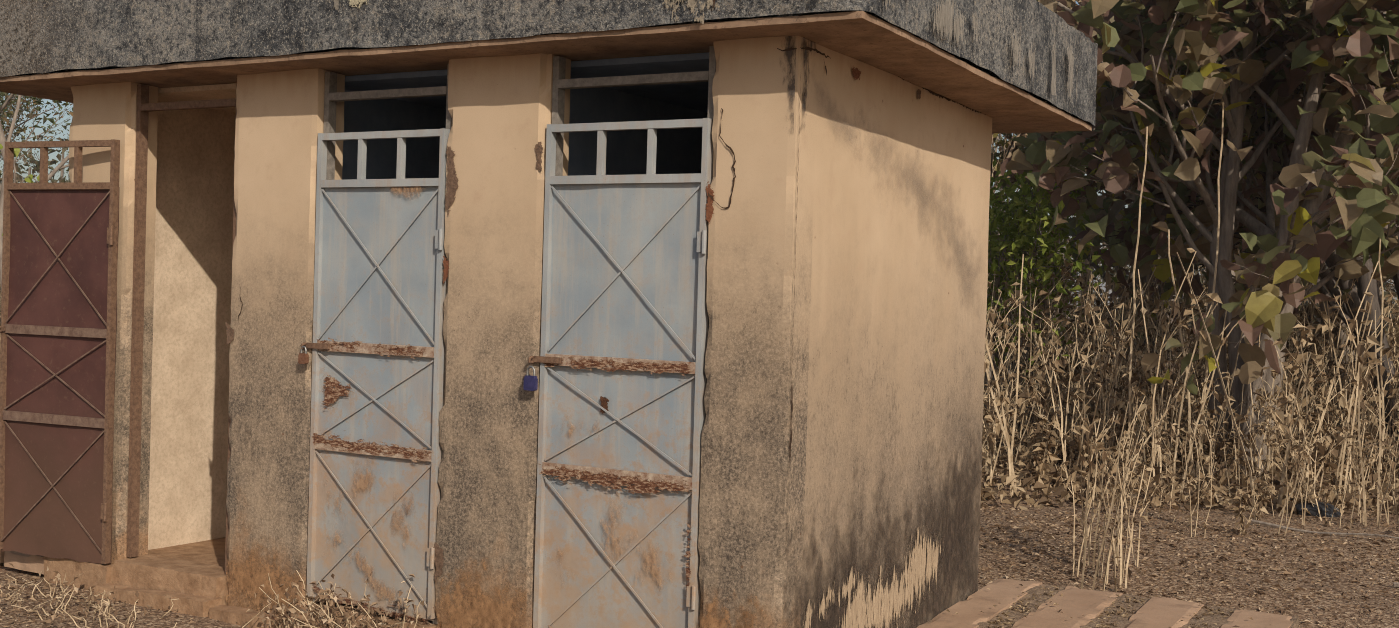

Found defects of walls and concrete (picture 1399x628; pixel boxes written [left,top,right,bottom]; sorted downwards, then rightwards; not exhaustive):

damp [933,0,981,46]
damp [730,0,817,131]
damp [1011,36,1074,99]
spalling [445,145,459,216]
crack [708,108,736,209]
corrosion [316,337,426,410]
corrosion [543,356,692,377]
corrosion [312,430,432,506]
corrosion [537,463,693,494]
corrosion [312,551,432,626]
corrosion [684,517,693,596]
damp [785,450,982,628]